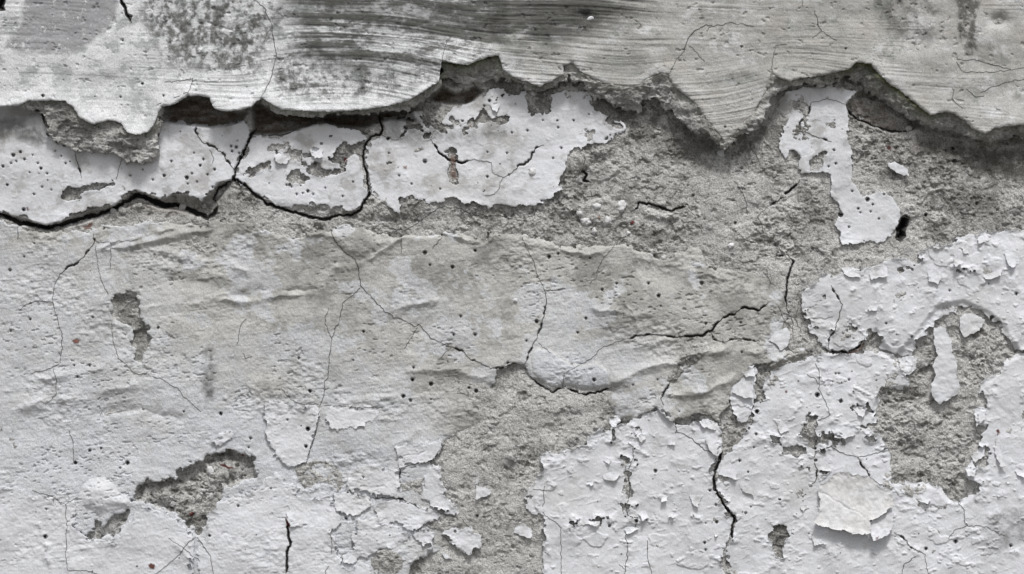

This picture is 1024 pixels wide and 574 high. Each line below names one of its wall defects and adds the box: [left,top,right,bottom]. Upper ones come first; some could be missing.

crack [32,490,97,574]
crack [284,519,292,573]
crack [0,116,894,488]
spalling [0,56,1024,360]
peeling [136,229,1024,574]
crack [660,366,736,543]